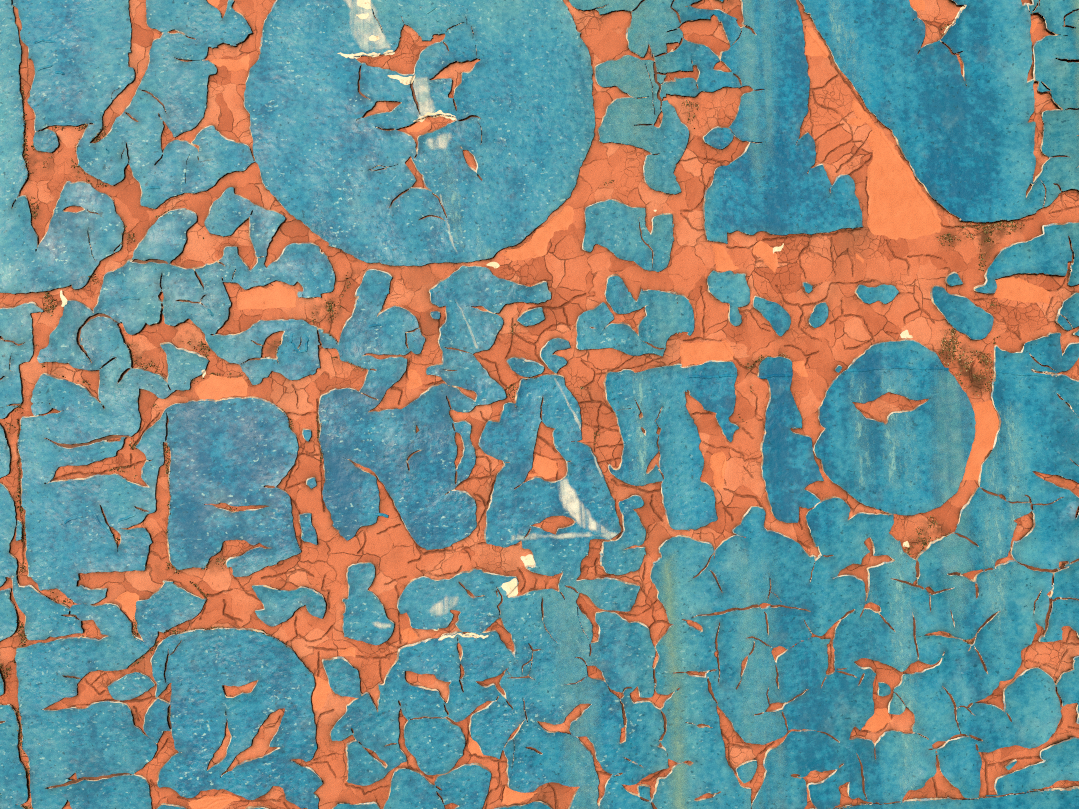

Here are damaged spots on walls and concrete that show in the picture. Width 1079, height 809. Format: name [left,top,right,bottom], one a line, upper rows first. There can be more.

crack [670,0,682,25]
crack [1066,239,1074,273]
peeling [0,0,329,809]
peeling [319,0,1079,712]
crack [1030,354,1079,418]
peeling [41,280,580,809]
peeling [537,703,623,809]
crack [692,553,811,682]
peeling [673,537,944,809]
crack [791,686,1079,809]
crack [918,459,1079,674]
peeling [967,623,1079,796]